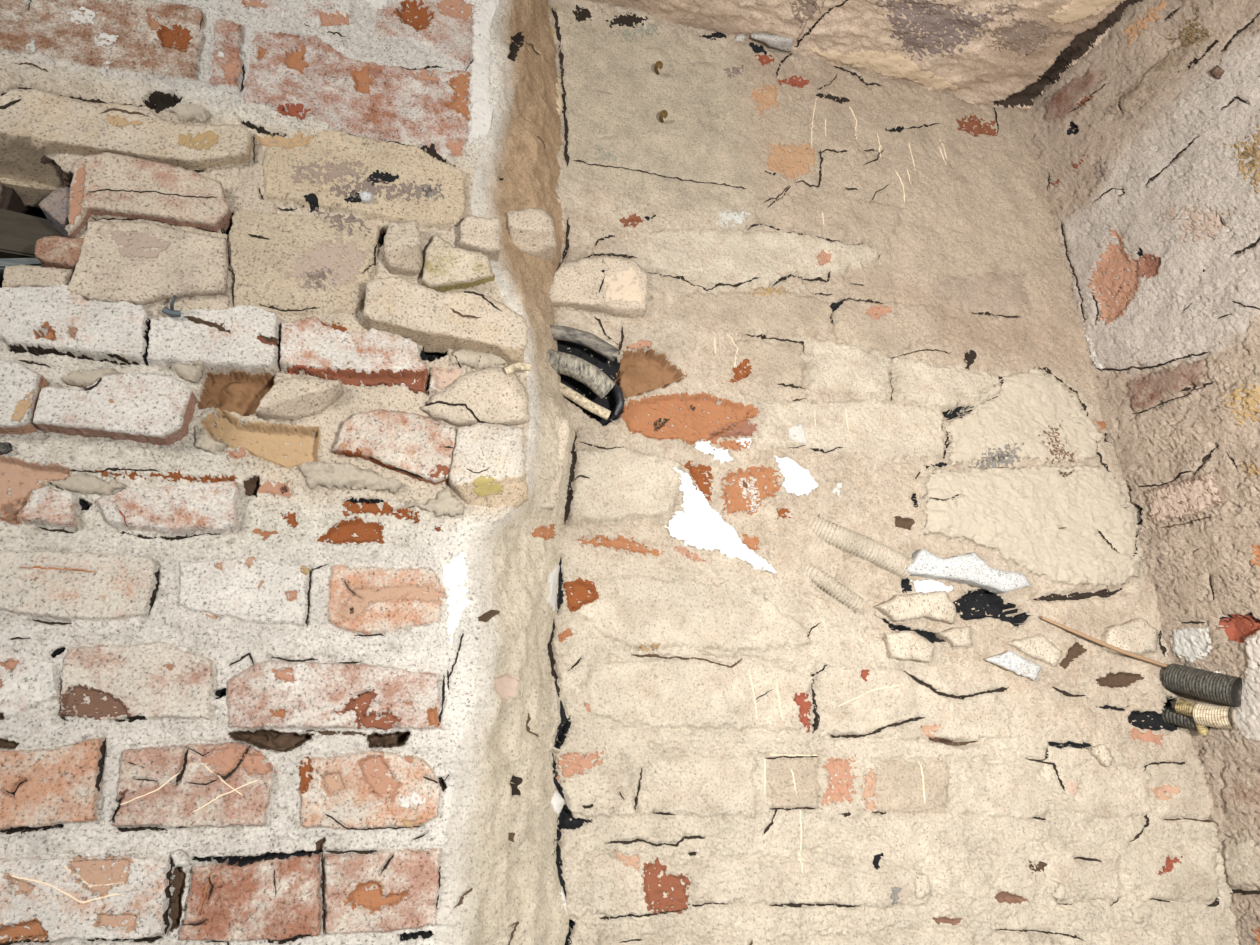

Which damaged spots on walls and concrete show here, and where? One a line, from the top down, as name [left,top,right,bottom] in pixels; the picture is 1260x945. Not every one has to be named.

spalling [67,152,232,306]
spalling [286,234,529,394]
flaking render [317,501,420,545]
crack [564,429,624,525]
flaking render [620,391,792,520]
crack [1038,352,1237,487]
crack [1033,588,1122,602]
crack [526,557,742,945]
crack [764,665,1009,759]
peeling [1171,614,1260,741]
flaking render [613,849,691,914]
crack [770,901,856,909]